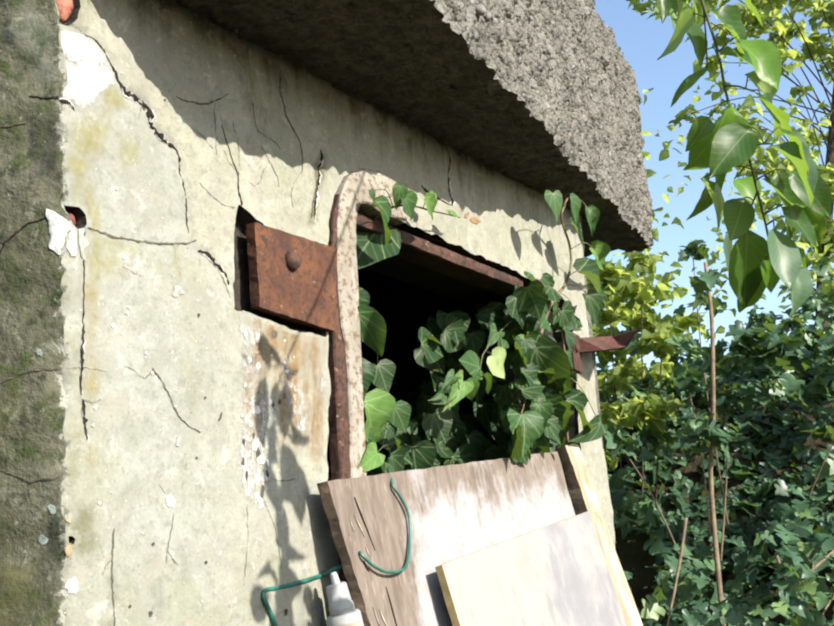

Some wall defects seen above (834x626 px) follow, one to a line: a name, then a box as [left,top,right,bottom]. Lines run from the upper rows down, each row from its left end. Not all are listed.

crack [0,217,47,253]
crack [83,33,229,285]
crack [222,127,243,205]
spalling [233,205,327,342]
crack [279,70,324,224]
crack [79,260,91,442]
crack [152,368,200,432]
peeling [240,324,308,509]